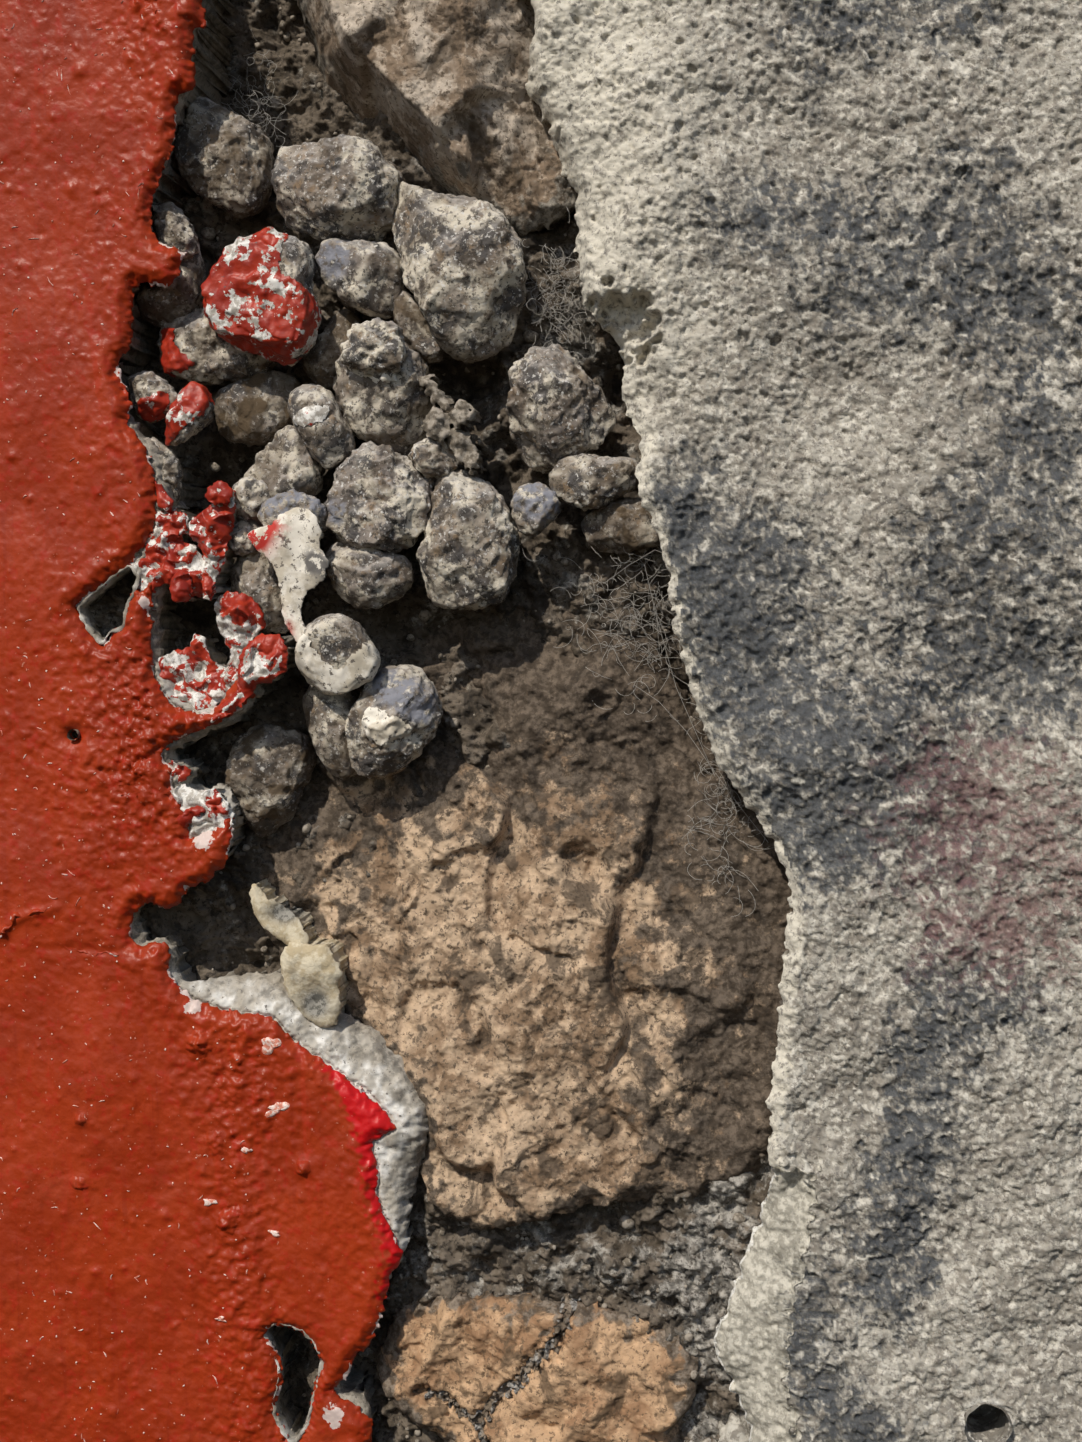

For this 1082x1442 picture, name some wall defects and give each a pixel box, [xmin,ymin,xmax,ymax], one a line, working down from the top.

spalling [221,0,450,194]
spalling [90,188,709,980]
crack [0,907,123,957]
peeling [261,1037,281,1055]
peeling [265,1102,290,1117]
spalling [284,1326,320,1418]
crack [412,1291,581,1442]
spalling [352,1153,774,1442]